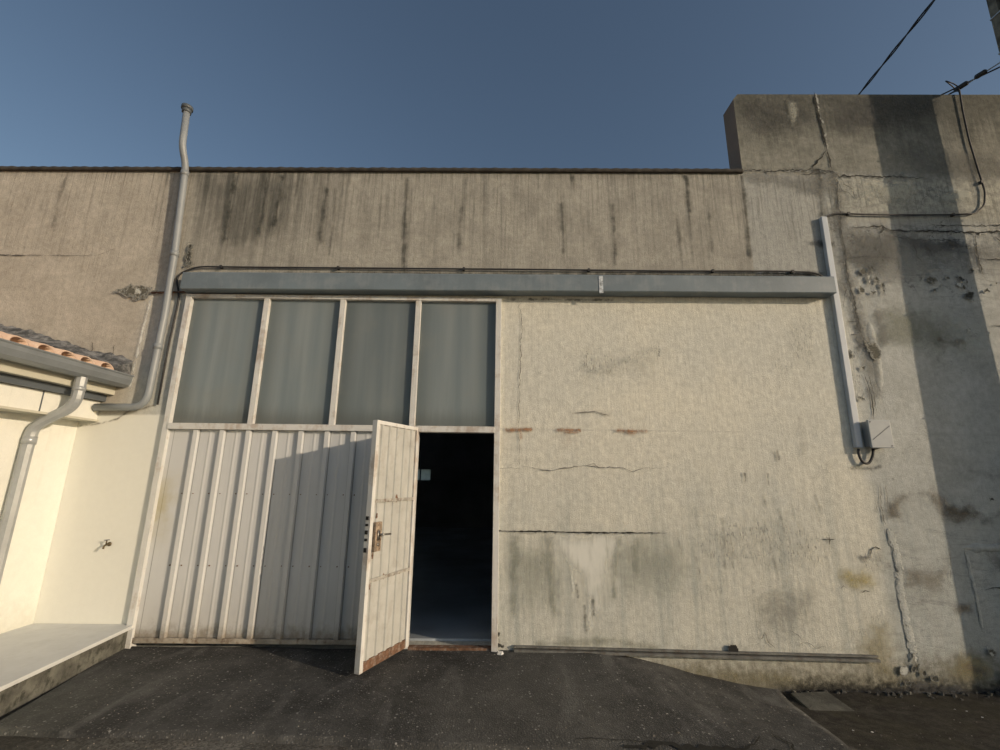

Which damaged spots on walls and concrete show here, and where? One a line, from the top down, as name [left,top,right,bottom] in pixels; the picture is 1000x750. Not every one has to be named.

crack [745,93,1000,345]
spalling [114,284,158,301]
spalling [921,266,997,301]
crack [500,306,640,472]
crack [870,487,888,555]
water stain [560,535,619,622]